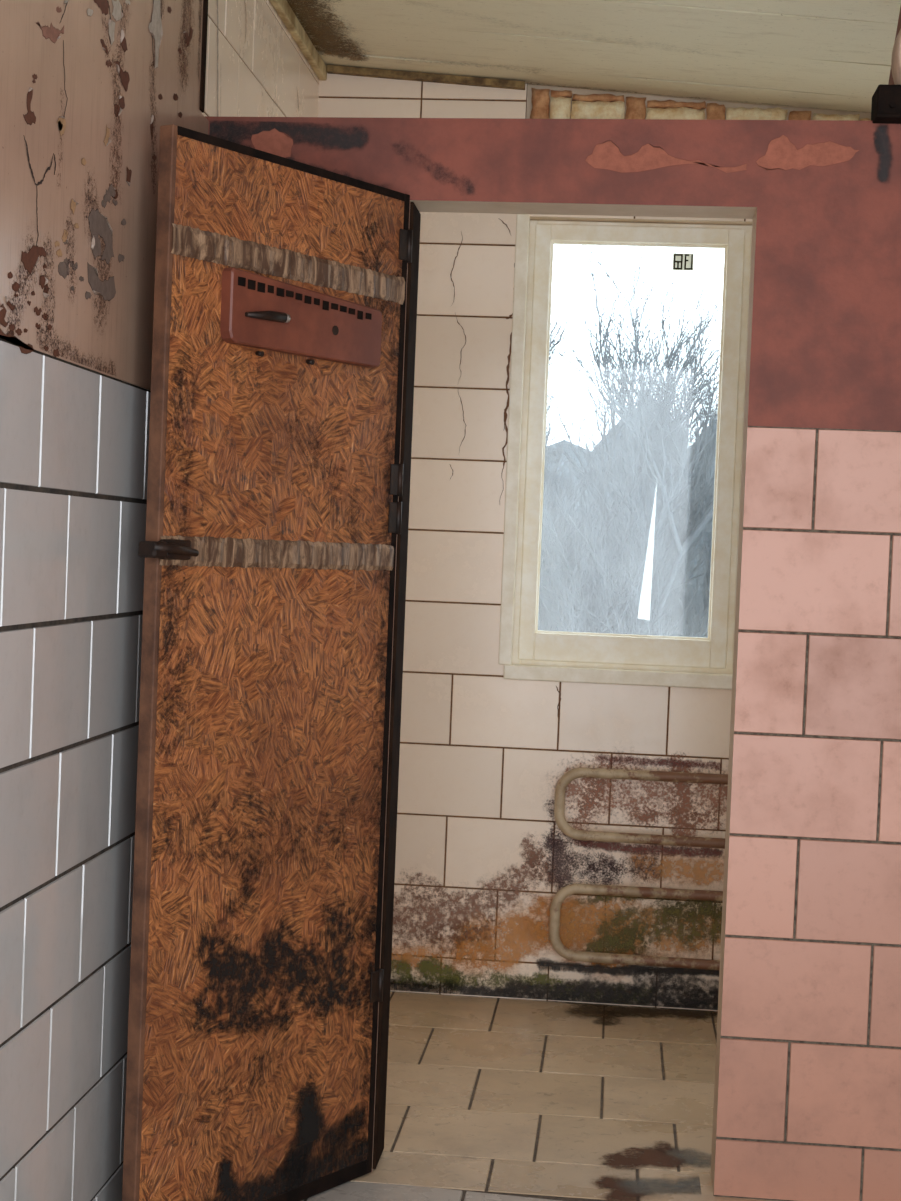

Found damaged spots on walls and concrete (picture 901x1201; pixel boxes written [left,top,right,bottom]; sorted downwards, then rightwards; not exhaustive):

peeling [148,0,194,183]
peeling [0,0,132,375]
crack [450,233,466,479]
crack [499,263,515,503]
leakage [187,796,380,1201]
leakage [393,800,661,950]
rust [391,897,722,970]
leakage [498,959,719,1008]
rust [556,755,728,885]
leakage [595,1143,711,1201]